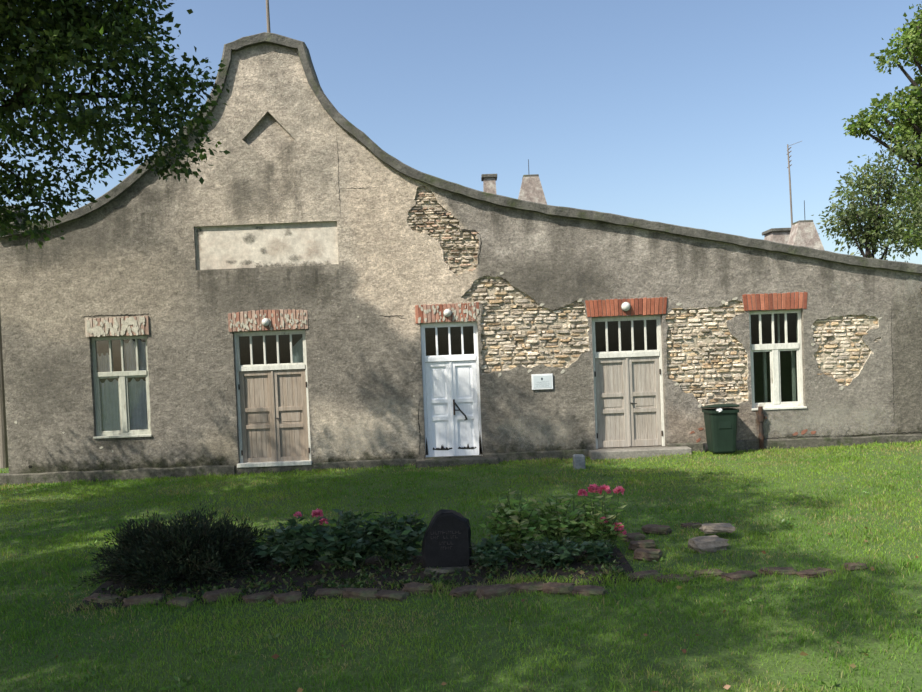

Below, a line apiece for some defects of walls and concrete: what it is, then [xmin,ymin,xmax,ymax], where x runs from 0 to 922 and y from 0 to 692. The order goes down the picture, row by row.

spalling [407,186,590,377]
peeling [86,316,145,337]
peeling [230,312,306,332]
spalling [666,297,749,408]
spalling [811,314,882,390]